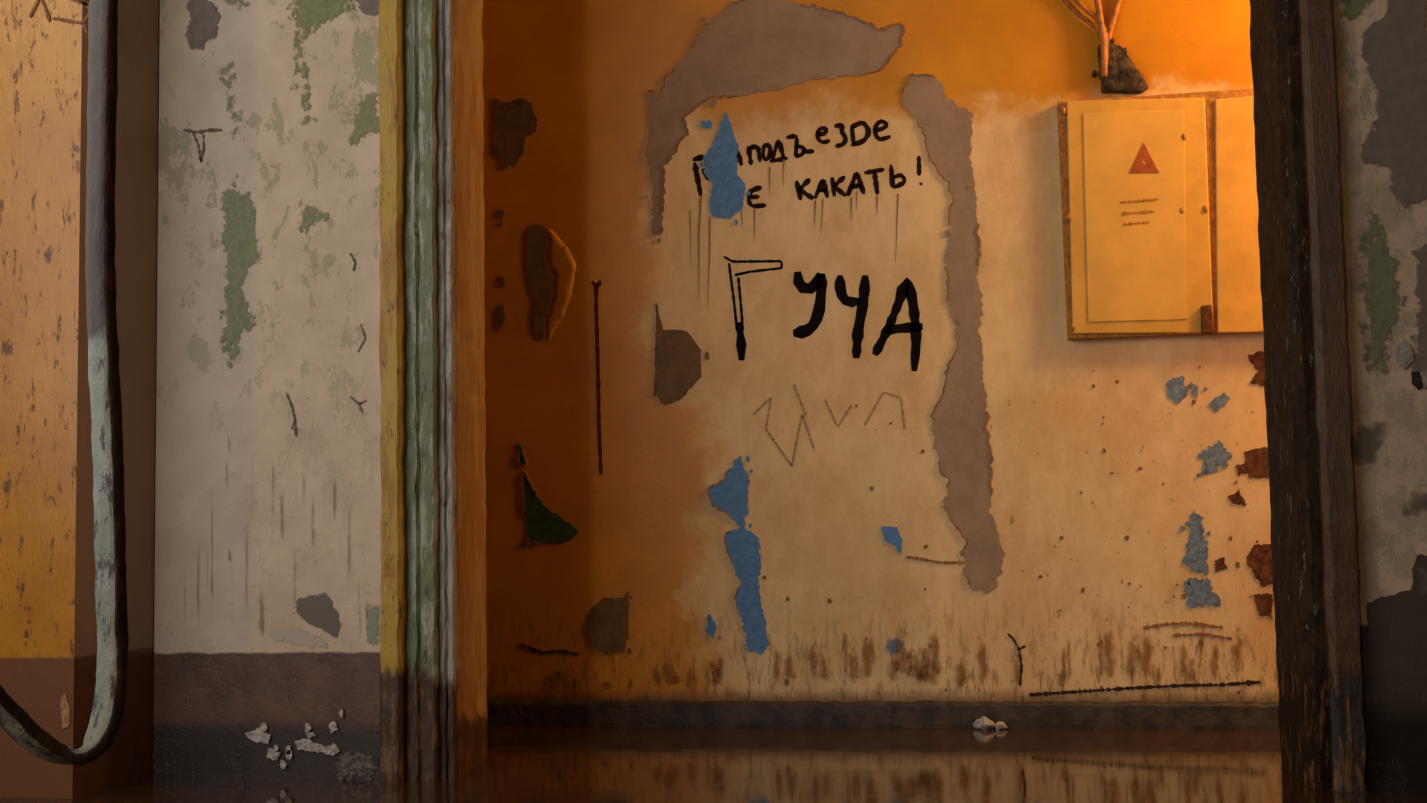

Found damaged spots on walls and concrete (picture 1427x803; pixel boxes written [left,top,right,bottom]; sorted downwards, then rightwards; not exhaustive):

peeling [185,0,250,50]
peeling [286,0,379,125]
peeling [645,0,906,243]
peeling [1339,0,1427,208]
peeling [219,175,261,369]
peeling [653,302,709,405]
peeling [901,73,1005,593]
peeling [1358,210,1427,390]
peeling [295,593,340,637]
peeling [705,456,770,655]
peeling [1173,511,1221,608]
peeling [245,709,379,780]